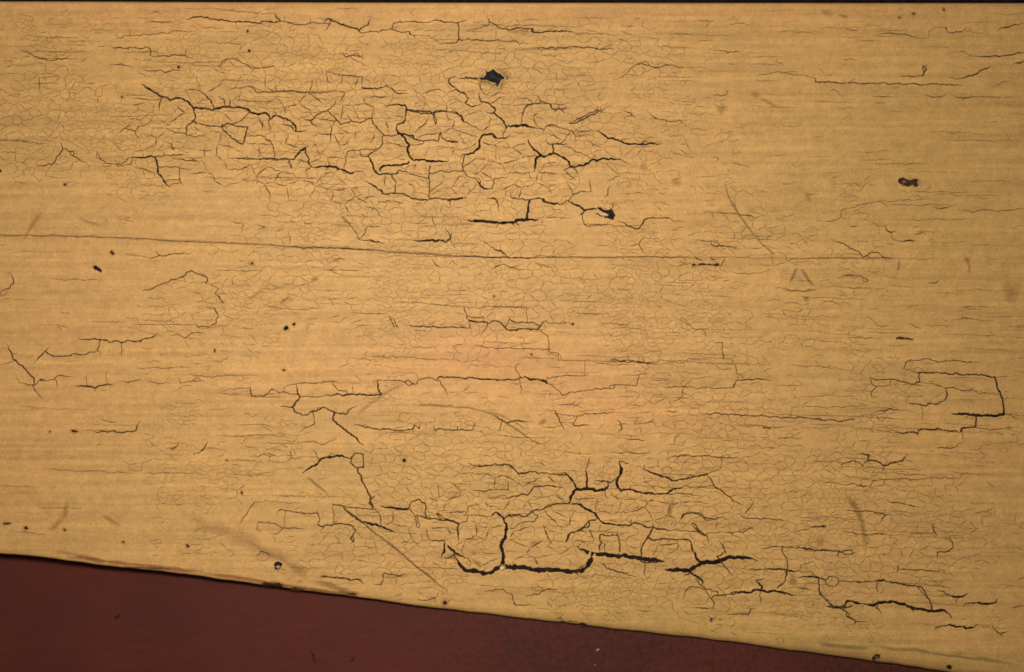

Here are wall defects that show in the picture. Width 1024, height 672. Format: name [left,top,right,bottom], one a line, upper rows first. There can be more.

crack [4,13,770,283]
crack [1,251,1022,637]